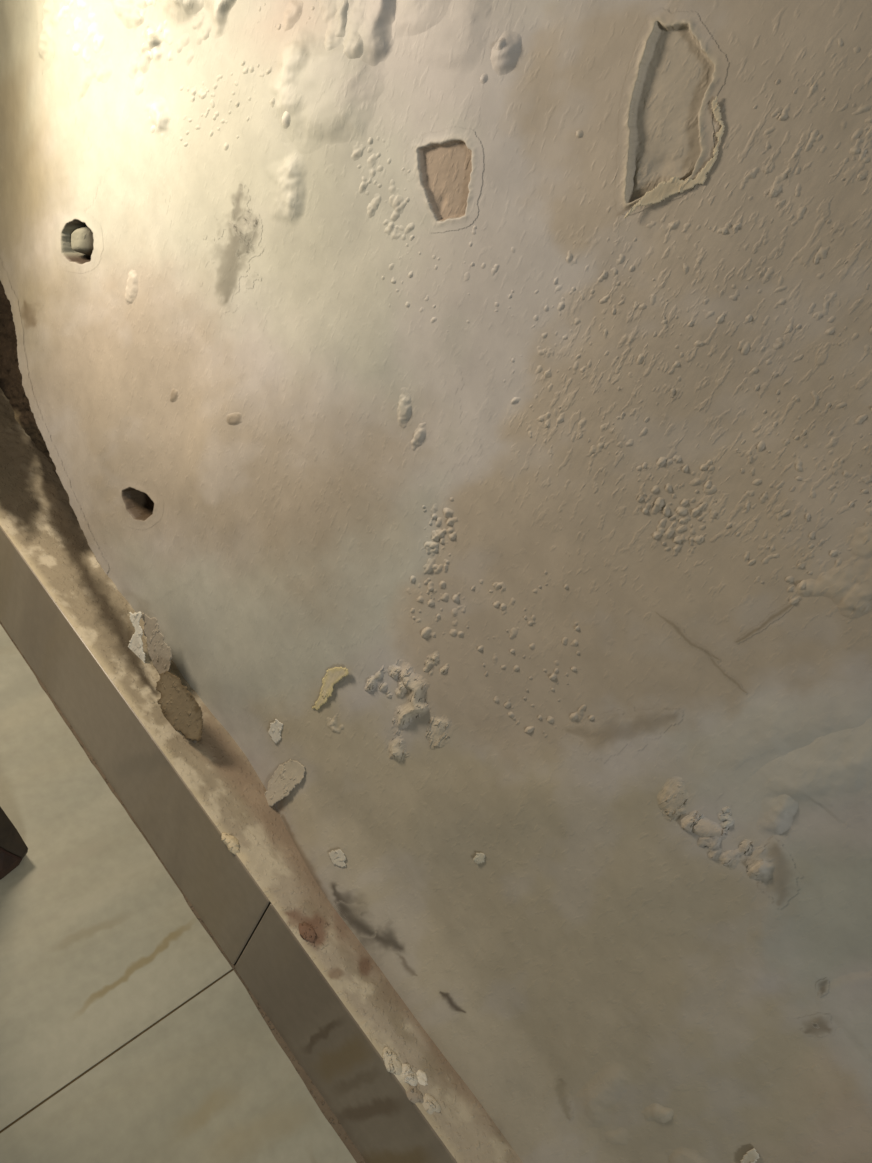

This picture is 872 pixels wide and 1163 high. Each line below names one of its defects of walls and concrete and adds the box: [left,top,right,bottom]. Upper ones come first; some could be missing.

peeling [614,8,729,218]
peeling [404,126,484,233]
flaking render [0,258,109,575]
leakage [0,0,872,764]
peeling [128,612,203,743]
peeling [312,667,349,734]
flaking render [364,650,452,762]
rust [281,902,330,950]
leakage [236,651,872,1163]
peeling [740,1148,760,1163]